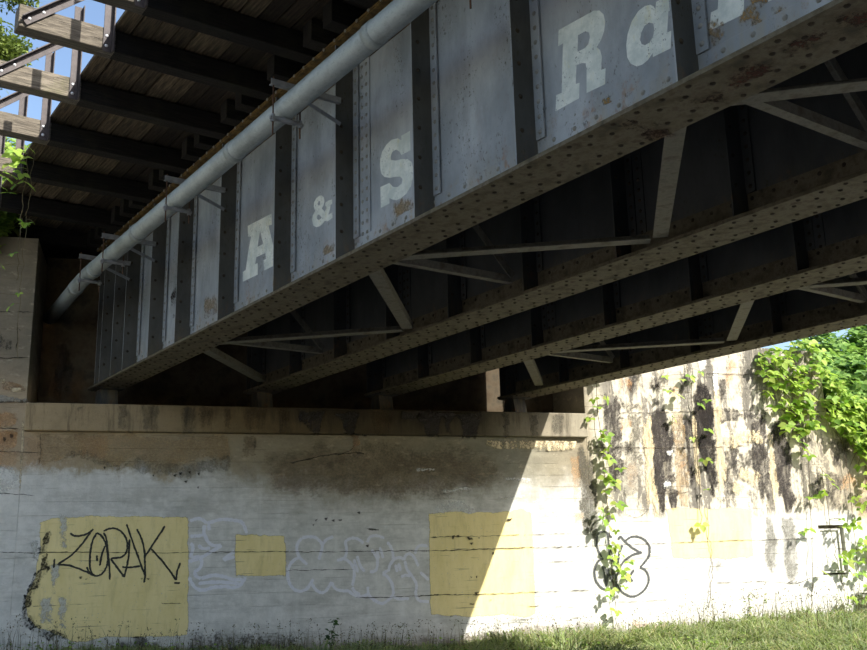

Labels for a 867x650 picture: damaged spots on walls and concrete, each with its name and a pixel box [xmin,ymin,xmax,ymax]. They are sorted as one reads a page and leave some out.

rust [740,0,768,25]
rust [394,199,414,217]
water stain [578,360,798,579]
water stain [815,439,849,509]